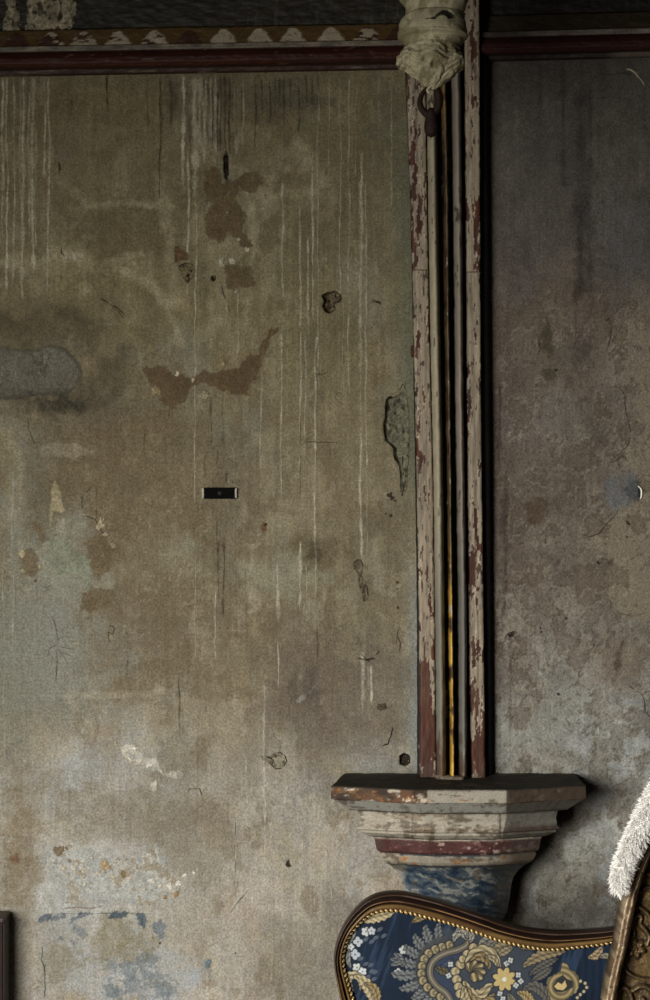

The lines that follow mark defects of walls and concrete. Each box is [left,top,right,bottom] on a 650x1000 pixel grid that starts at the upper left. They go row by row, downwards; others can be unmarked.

water stain [1,79,50,287]
water stain [181,78,243,270]
peeling [204,151,263,252]
water stain [299,167,319,322]
flaking render [321,291,342,313]
water stain [0,333,96,417]
peeling [143,328,278,408]